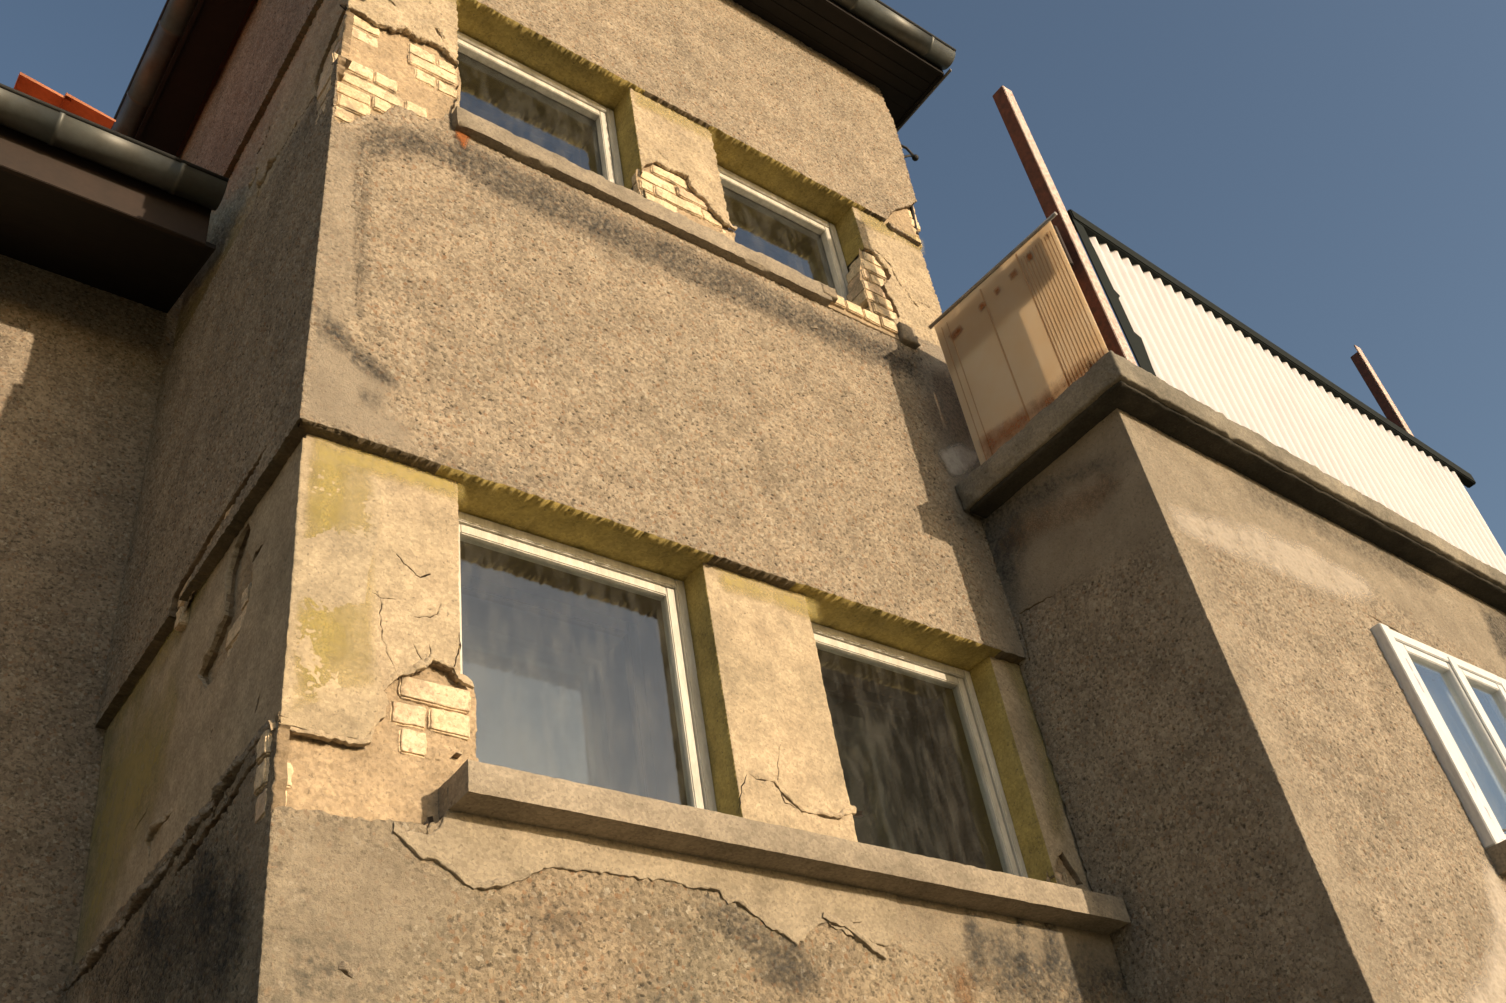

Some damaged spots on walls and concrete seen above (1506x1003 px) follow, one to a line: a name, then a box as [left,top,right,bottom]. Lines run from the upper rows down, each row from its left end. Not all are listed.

flaking render [315,0,461,125]
flaking render [632,159,738,241]
leakage [372,129,913,376]
flaking render [821,246,900,340]
flaking render [254,438,899,947]
crack [423,816,434,826]
crack [739,769,865,820]
crack [822,910,887,960]
leakage [968,917,1127,1003]